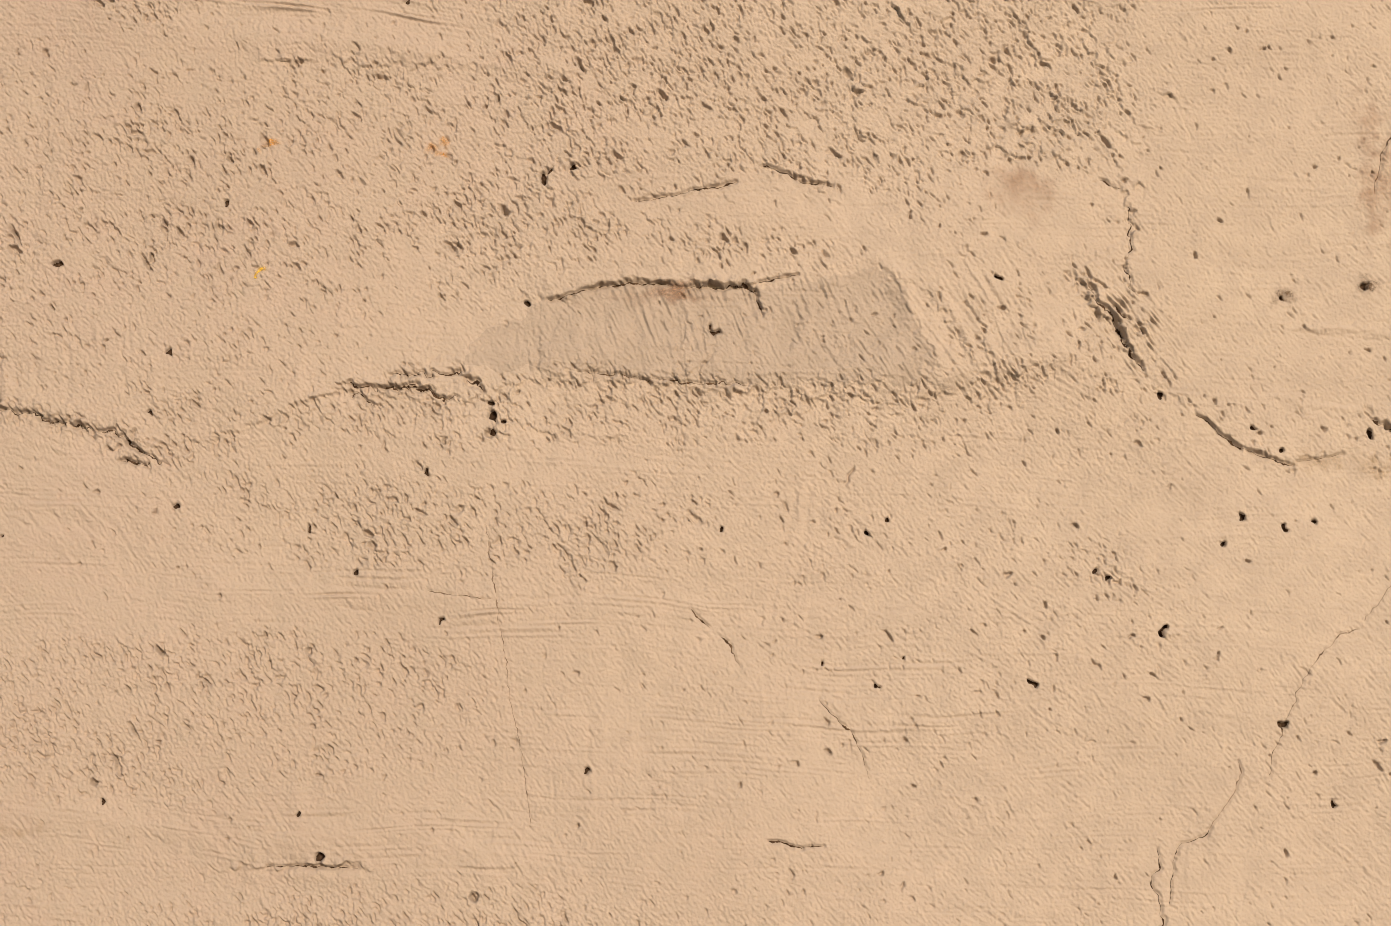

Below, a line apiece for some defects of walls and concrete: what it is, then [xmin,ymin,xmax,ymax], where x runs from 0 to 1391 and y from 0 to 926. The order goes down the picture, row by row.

crack [548,273,796,311]
crack [1088,174,1146,370]
crack [350,370,483,408]
crack [0,401,160,466]
crack [1198,413,1339,466]
crack [1150,586,1391,926]